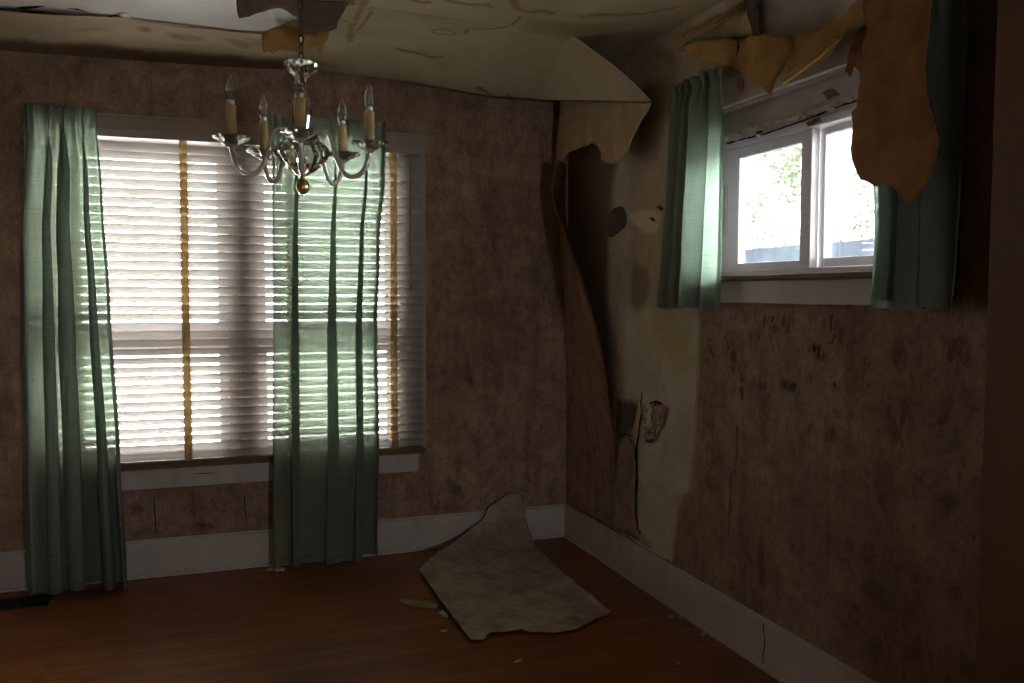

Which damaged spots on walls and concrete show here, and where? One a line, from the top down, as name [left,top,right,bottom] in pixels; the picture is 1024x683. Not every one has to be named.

water stain [407,0,681,41]
water stain [568,143,697,424]
flaking render [552,0,858,562]
crack [616,392,652,548]